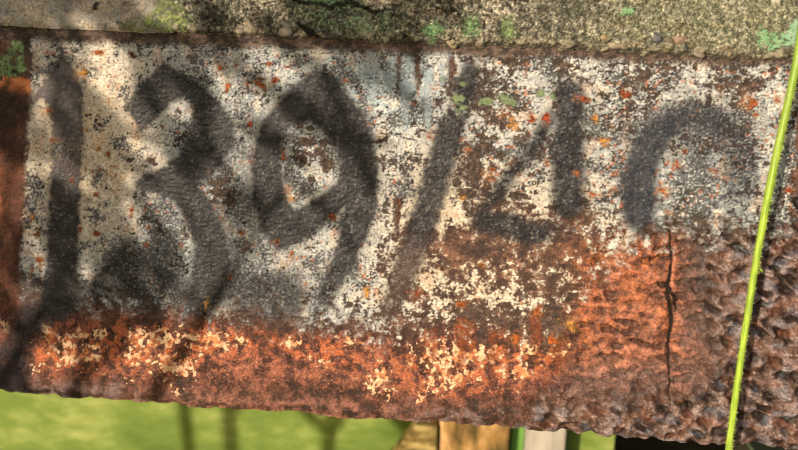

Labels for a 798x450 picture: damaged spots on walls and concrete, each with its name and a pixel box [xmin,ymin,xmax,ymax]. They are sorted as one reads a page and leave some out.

spalling [190,21,308,40]
rust [448,58,457,83]
peeling [0,36,798,396]
rust [0,138,798,450]
crack [664,226,678,405]